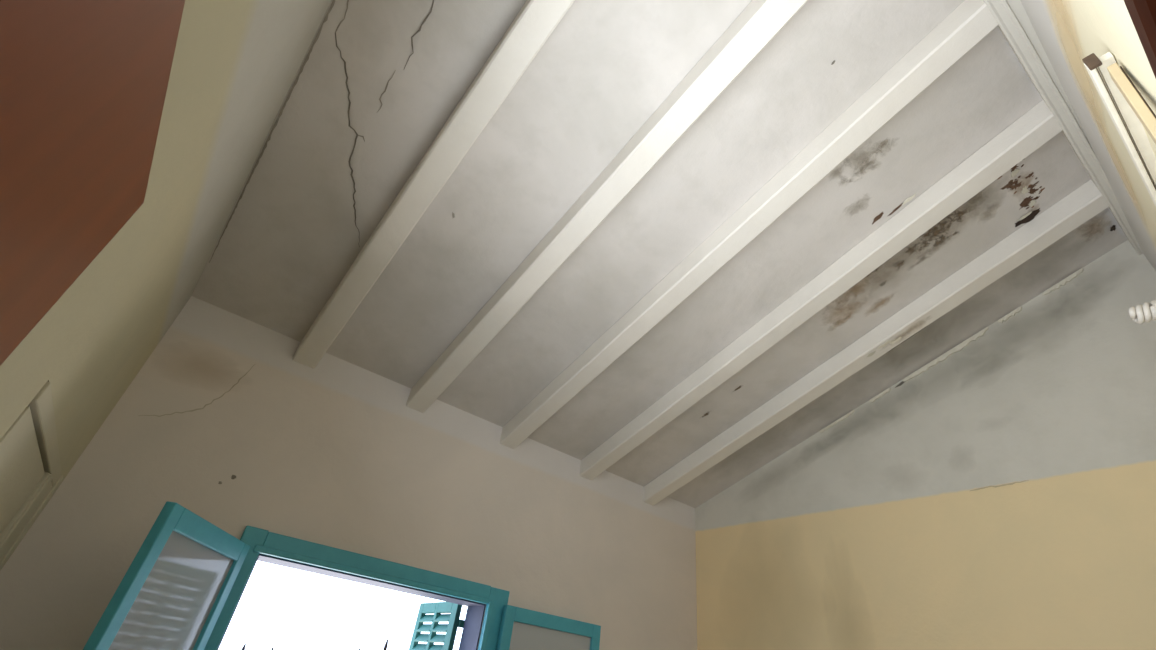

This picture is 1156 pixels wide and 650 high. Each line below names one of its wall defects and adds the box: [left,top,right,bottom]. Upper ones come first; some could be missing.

crack [209,0,434,263]
leakage [897,211,965,267]